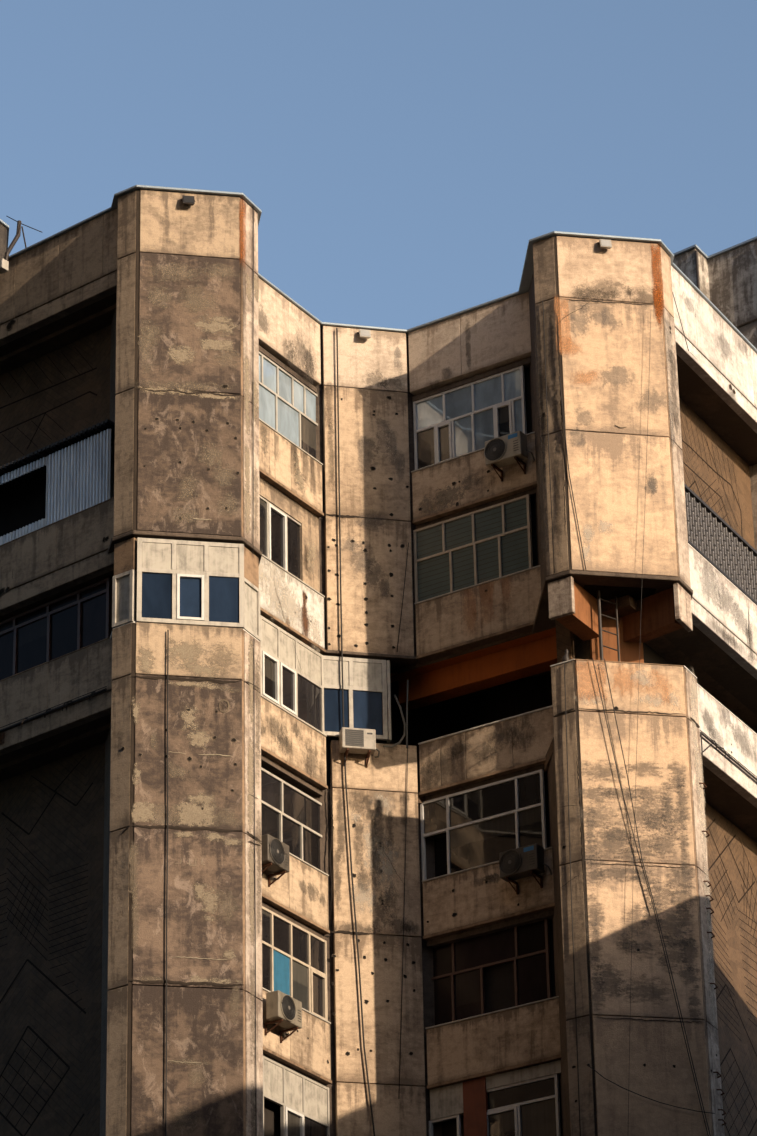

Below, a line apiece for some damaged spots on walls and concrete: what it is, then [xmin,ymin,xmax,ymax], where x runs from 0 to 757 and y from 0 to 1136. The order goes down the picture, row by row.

corrosion [651,246,664,324]